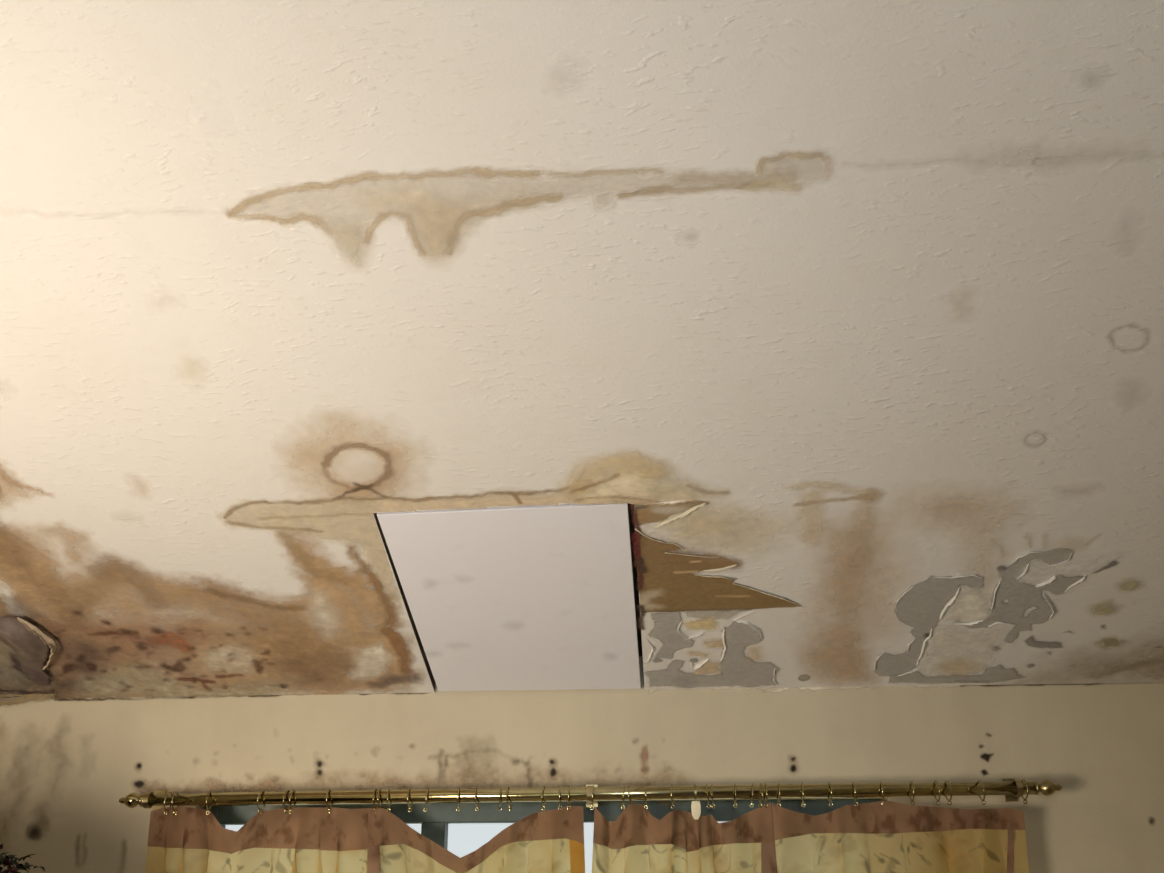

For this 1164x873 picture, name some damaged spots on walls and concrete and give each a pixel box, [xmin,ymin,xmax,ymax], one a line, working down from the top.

leakage [230,153,829,255]
peeling [0,640,55,706]
leakage [0,431,585,699]
peeling [645,610,779,688]
leakage [812,537,864,679]
peeling [874,549,1117,684]